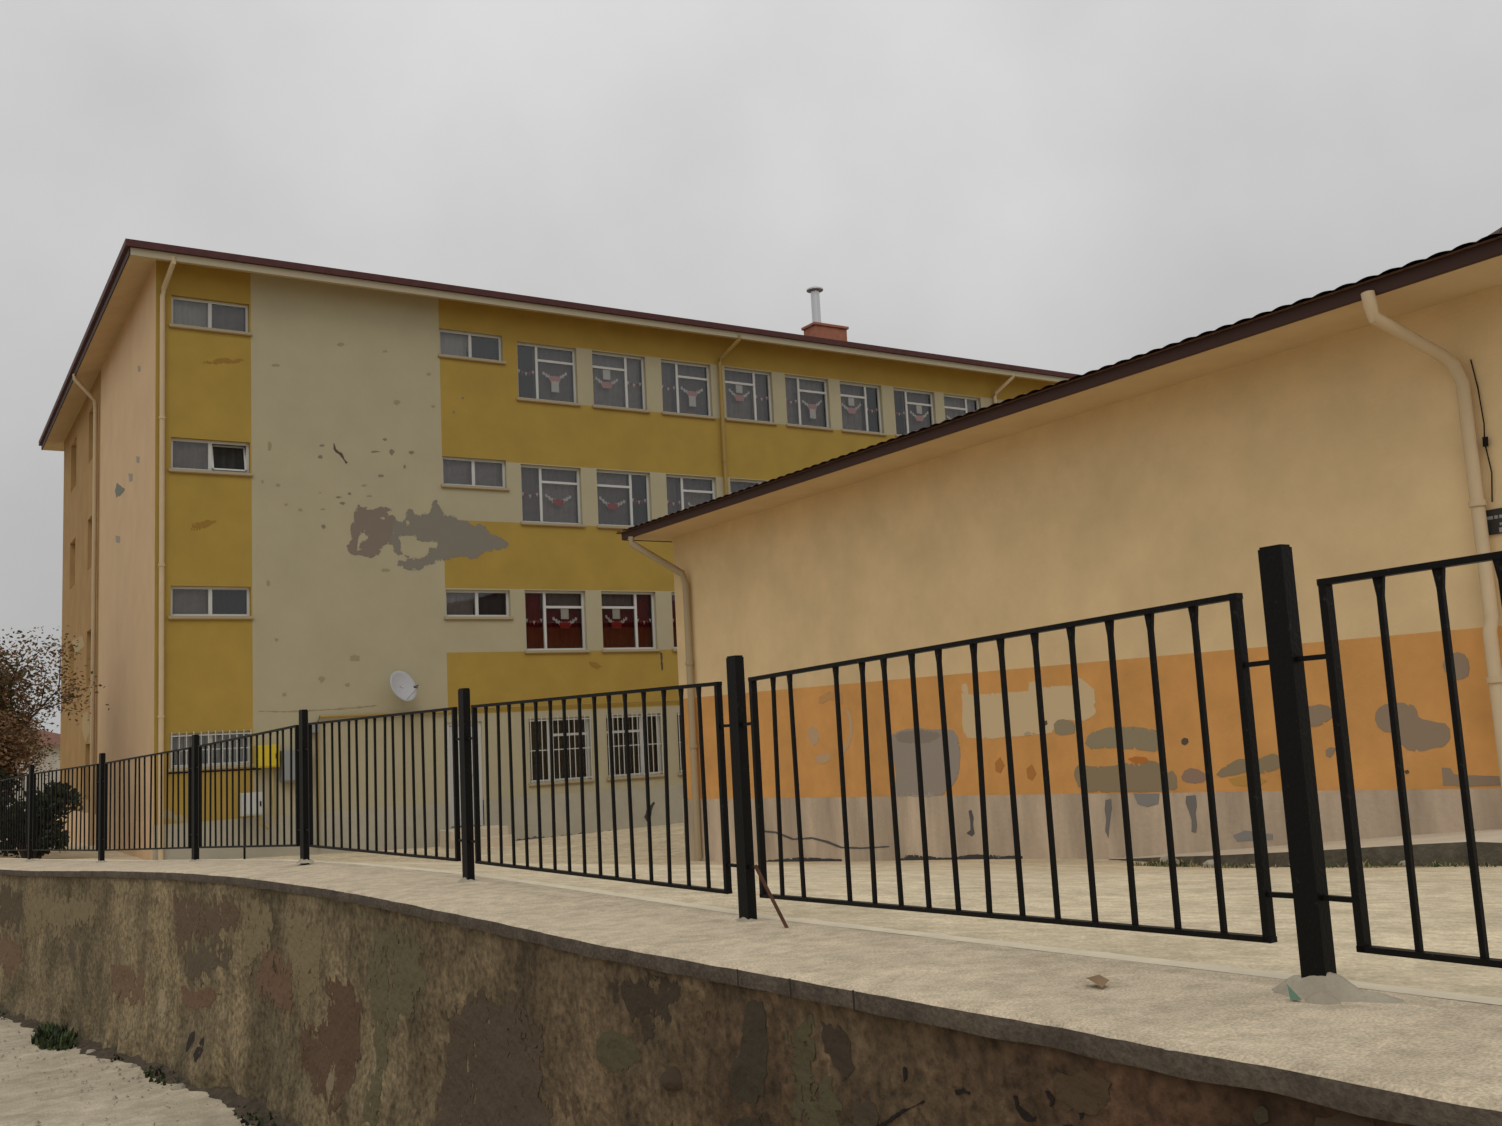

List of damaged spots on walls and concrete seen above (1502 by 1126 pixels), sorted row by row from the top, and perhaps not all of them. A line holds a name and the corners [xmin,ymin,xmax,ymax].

peeling [321,474,509,572]
peeling [961,678,1096,739]